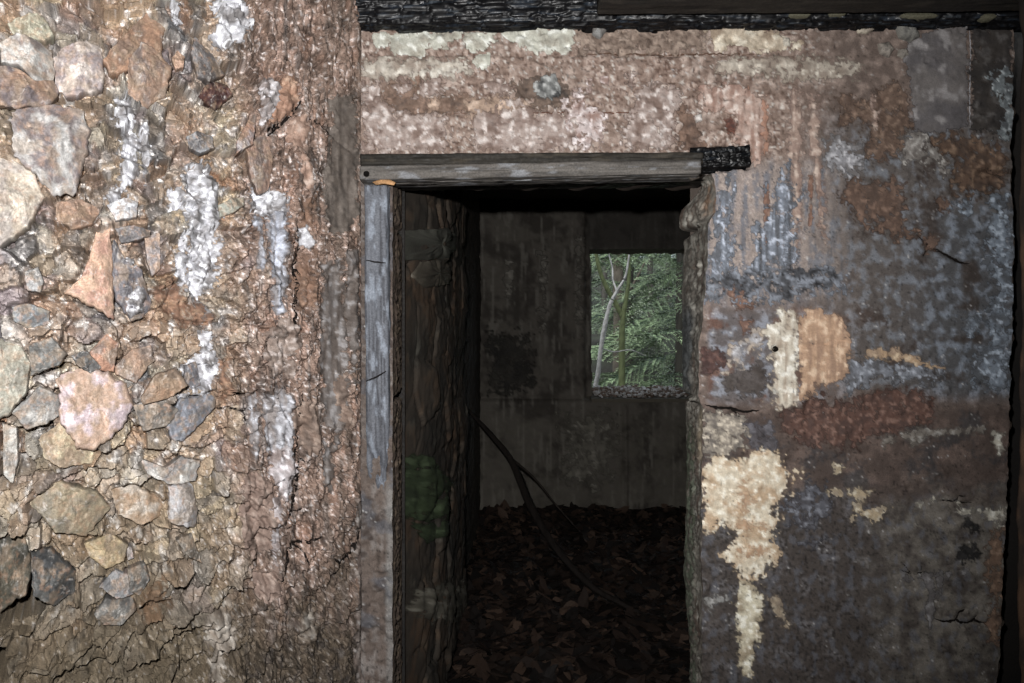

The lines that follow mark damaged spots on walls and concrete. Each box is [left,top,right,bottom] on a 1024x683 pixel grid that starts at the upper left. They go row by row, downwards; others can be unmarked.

efflorescence [169,0,183,26]
efflorescence [208,0,255,51]
efflorescence [103,91,152,204]
efflorescence [258,77,282,126]
peeling [266,28,804,235]
efflorescence [166,159,225,301]
efflorescence [248,185,317,322]
crack [705,404,759,418]
efflorescence [246,382,298,570]